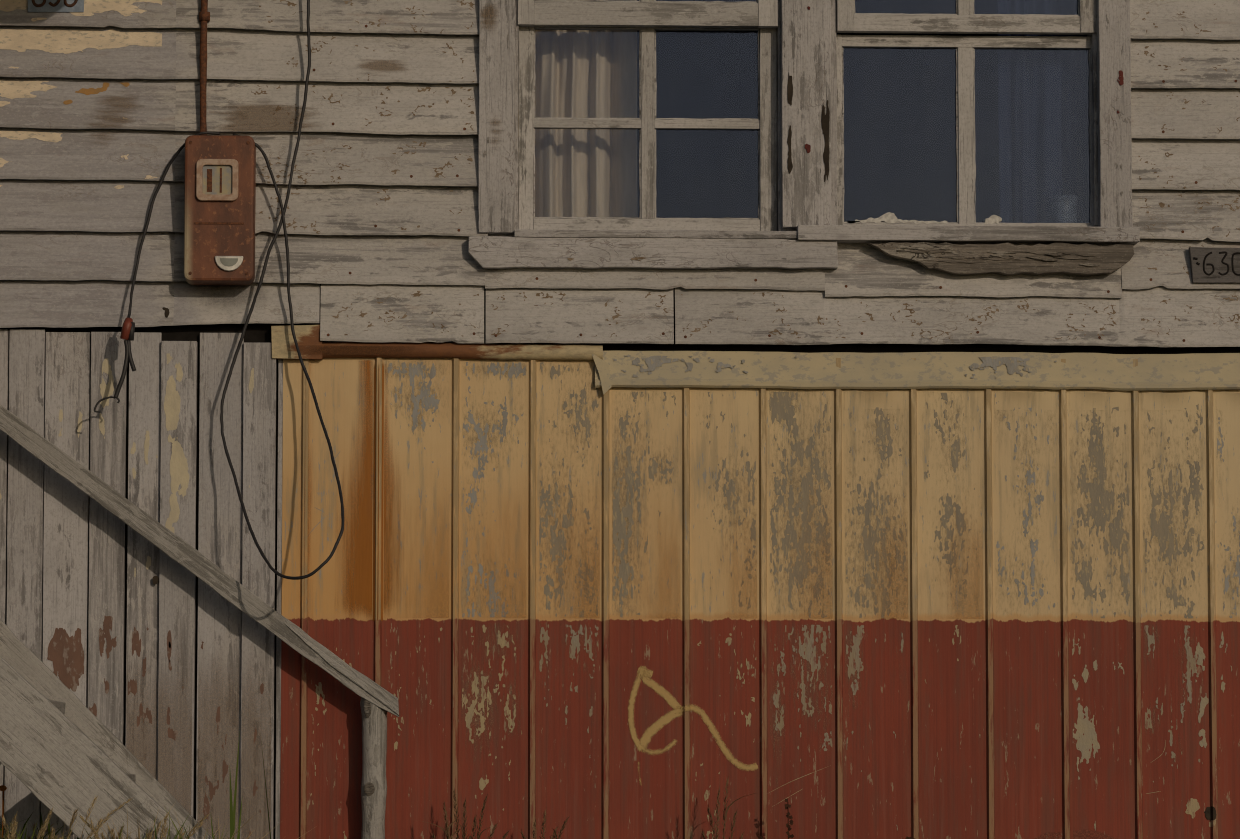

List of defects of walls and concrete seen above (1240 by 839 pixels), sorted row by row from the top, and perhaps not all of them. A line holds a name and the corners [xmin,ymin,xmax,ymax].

corrosion [319,345,398,621]
peeling [387,362,440,435]
peeling [462,362,676,798]
peeling [614,355,748,377]
peeling [706,392,853,762]
peeling [846,407,907,695]
peeling [927,393,966,473]
peeling [933,493,980,605]
peeling [965,357,1031,378]
peeling [995,393,1055,607]
peeling [1071,404,1209,780]